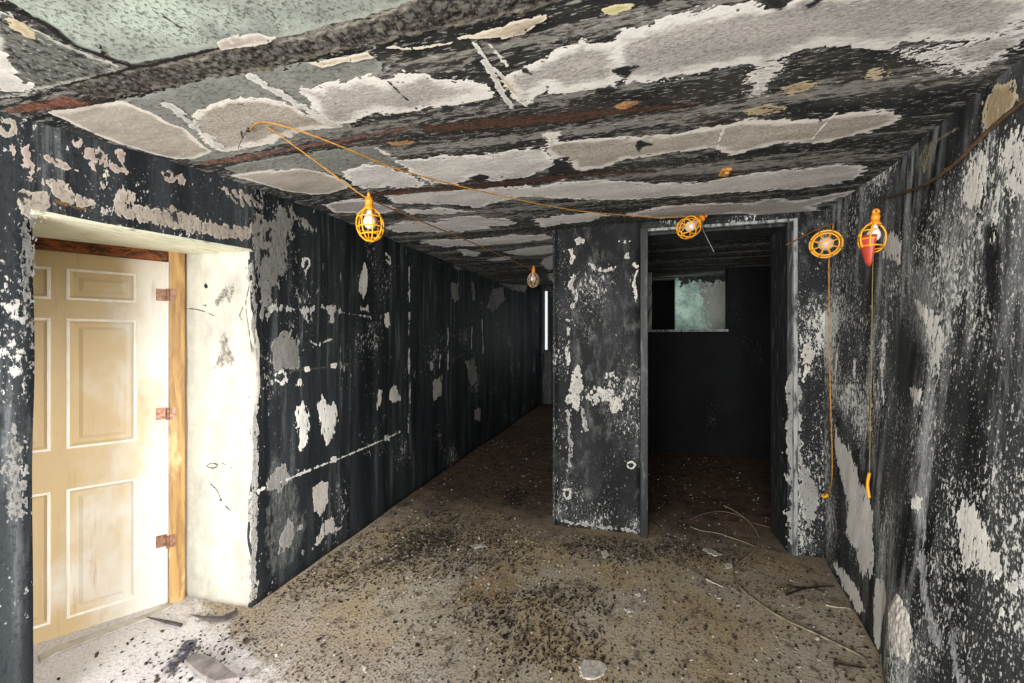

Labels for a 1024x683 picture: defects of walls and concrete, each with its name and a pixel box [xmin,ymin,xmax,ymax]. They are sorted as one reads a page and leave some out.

rust [5,97,98,114]
rust [194,101,696,166]
peeling [0,0,1024,281]
peeling [358,262,368,299]
peeling [588,240,639,302]
peeling [0,117,317,603]
peeling [565,237,625,471]
peeling [294,395,337,451]
peeling [782,342,820,547]
peeling [278,481,342,555]
peeling [833,425,886,668]
peeling [956,492,1023,600]